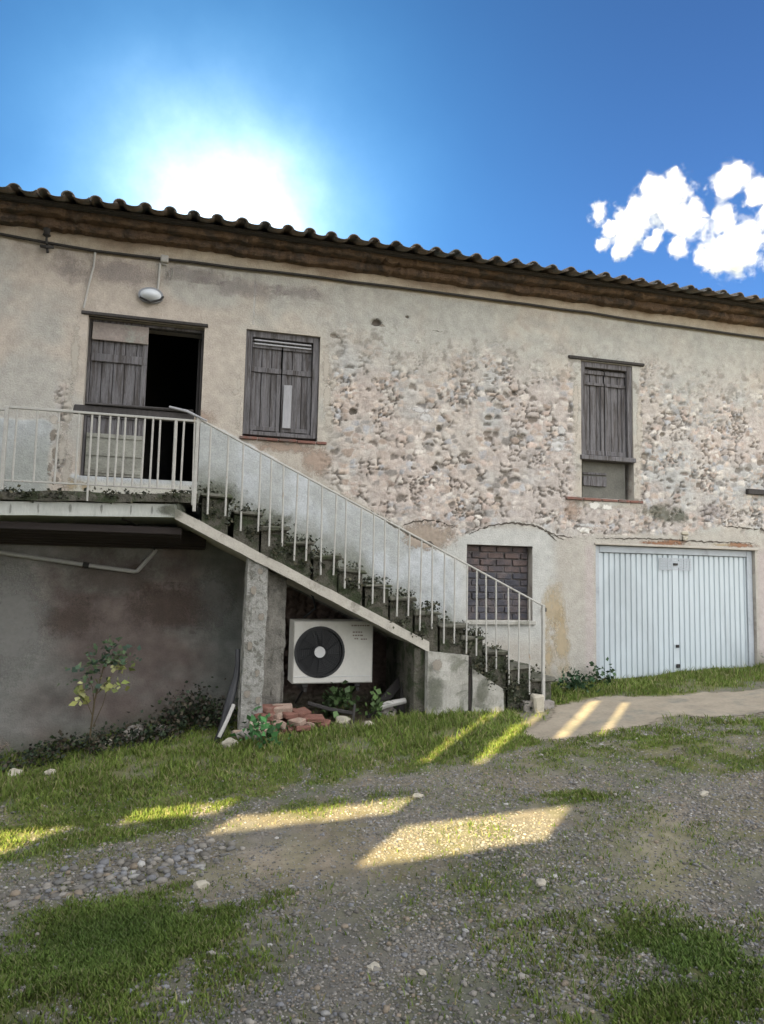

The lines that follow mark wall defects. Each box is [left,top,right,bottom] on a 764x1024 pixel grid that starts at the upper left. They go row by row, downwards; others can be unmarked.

peeling [411,407,442,431]
peeling [550,385,579,452]
crack [371,510,764,549]
flaking render [565,501,612,533]